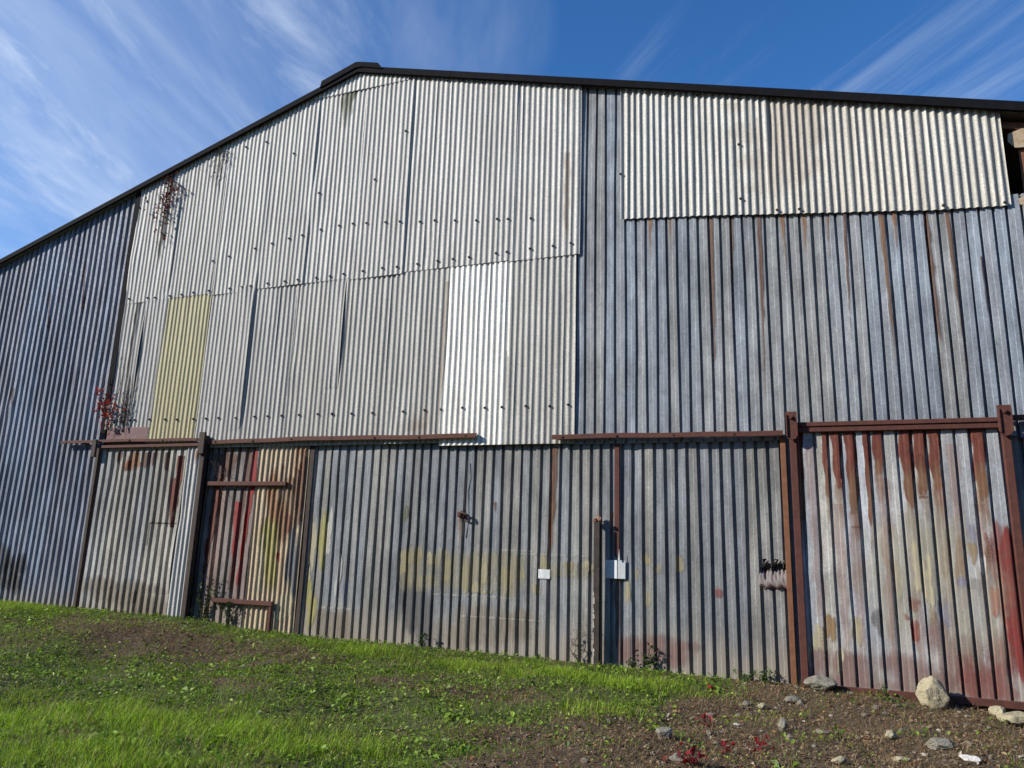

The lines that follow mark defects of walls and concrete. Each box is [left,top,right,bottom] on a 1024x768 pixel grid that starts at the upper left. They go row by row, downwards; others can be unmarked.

rust [878,212,896,332]
rust [923,212,940,333]
rust [945,211,963,334]
rust [117,450,199,528]
rust [202,452,255,599]
rust [261,446,308,536]
rust [547,447,558,555]
rust [796,433,805,520]
rust [821,431,883,528]
rust [898,430,942,509]
rust [969,429,988,500]